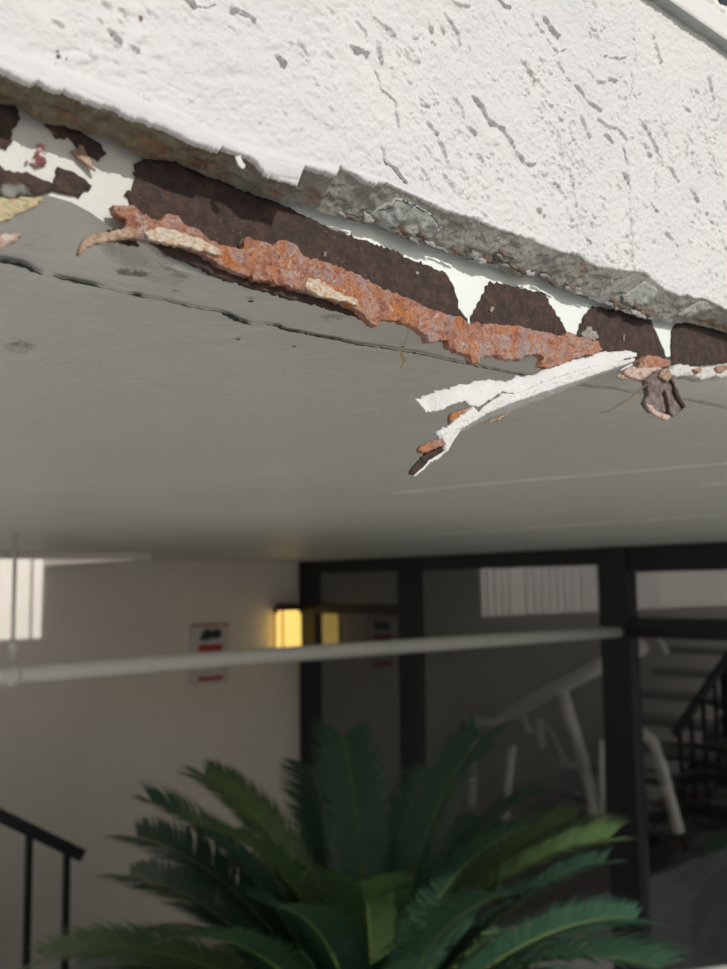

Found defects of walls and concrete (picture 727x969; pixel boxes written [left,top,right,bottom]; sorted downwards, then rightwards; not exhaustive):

peeling [71,144,96,171]
peeling [115,268,151,277]
rust [75,158,727,370]
spalling [337,198,589,299]
crack [0,260,526,376]
spalling [603,281,658,319]
spalling [677,301,712,318]
peeling [662,362,727,382]
peeling [408,350,637,477]